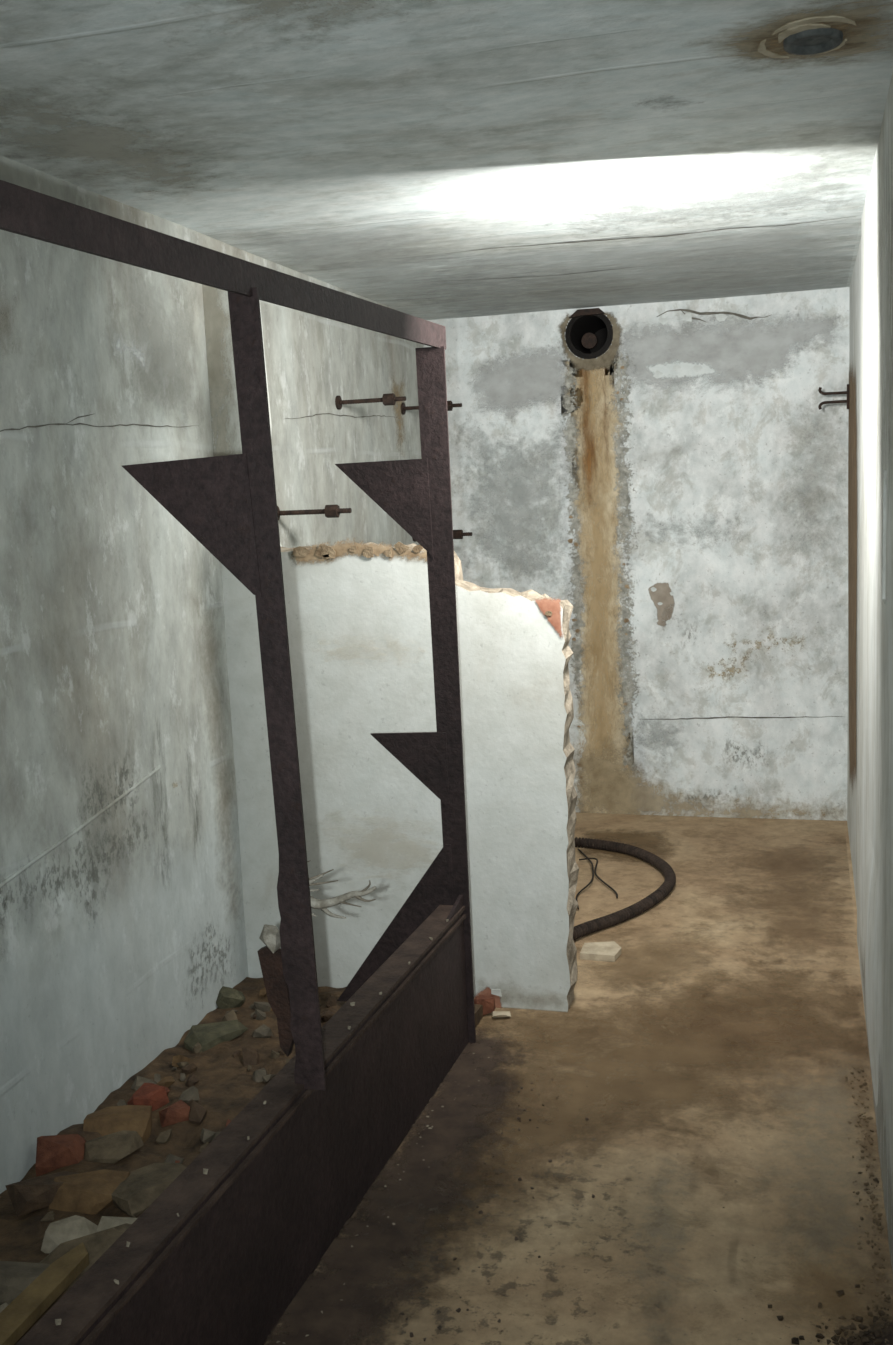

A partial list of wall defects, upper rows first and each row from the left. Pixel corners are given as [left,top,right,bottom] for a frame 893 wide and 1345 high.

corrosion [724,0,893,63]
crack [0,414,195,432]
corrosion [559,313,640,814]
spalling [535,598,563,637]
leakage [35,826,140,905]
leakage [423,942,868,1242]